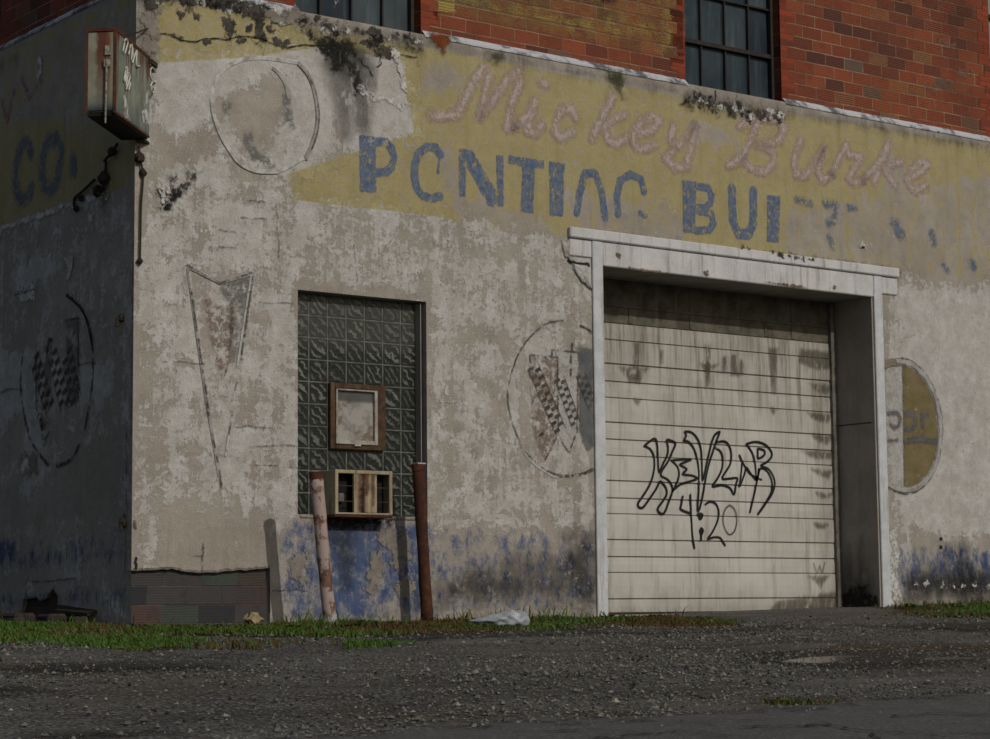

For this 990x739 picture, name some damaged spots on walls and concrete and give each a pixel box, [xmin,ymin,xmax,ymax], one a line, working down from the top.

damp [298,14,362,95]
damp [371,41,399,59]
damp [723,356,743,374]
damp [801,350,830,369]
spalling [20,587,81,622]
damp [773,577,877,609]